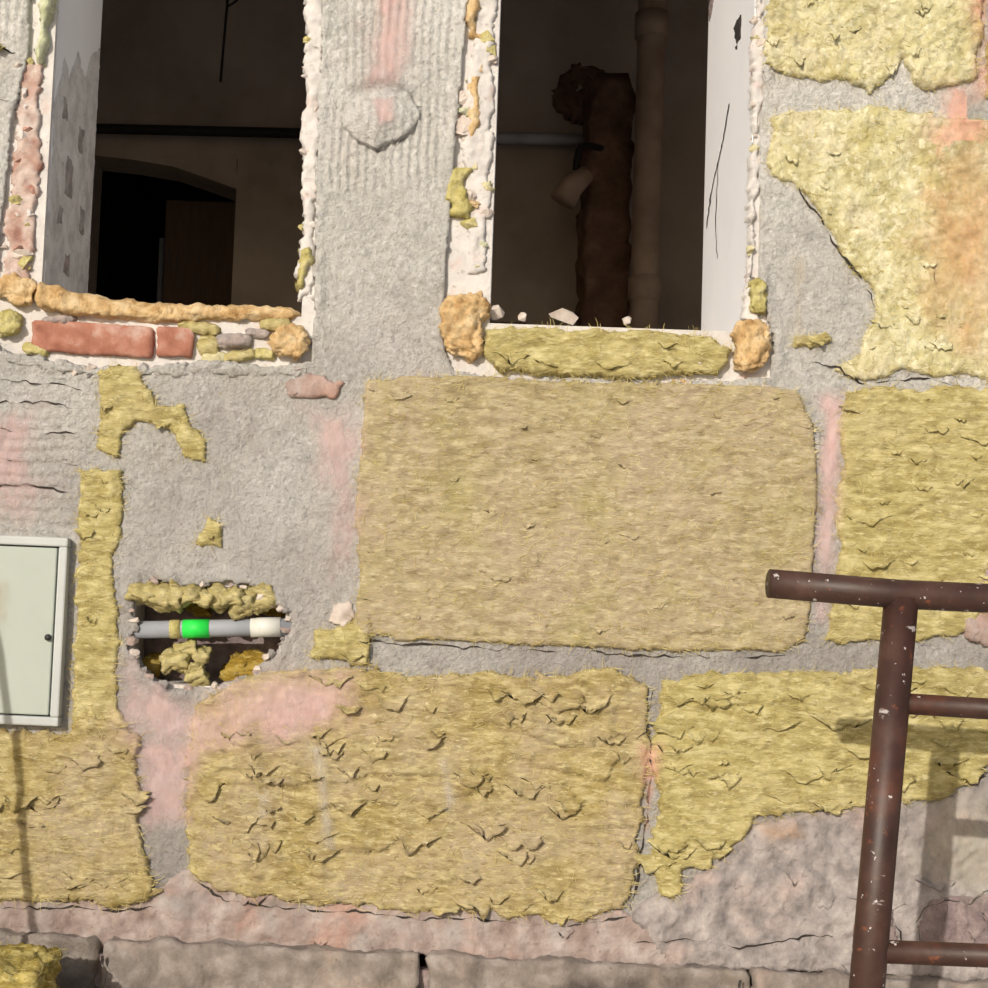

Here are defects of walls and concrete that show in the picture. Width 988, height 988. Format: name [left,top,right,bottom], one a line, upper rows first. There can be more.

peeling [915,3,934,16]
spalling [739,0,781,321]
spalling [124,576,291,691]
spalling [963,613,988,647]
peeling [308,674,353,689]
peeling [303,724,394,779]
peeling [413,730,446,750]
peeling [501,687,612,725]
peeling [651,728,741,790]
peeling [765,712,872,731]
peeling [454,768,584,820]
peeling [0,790,865,974]